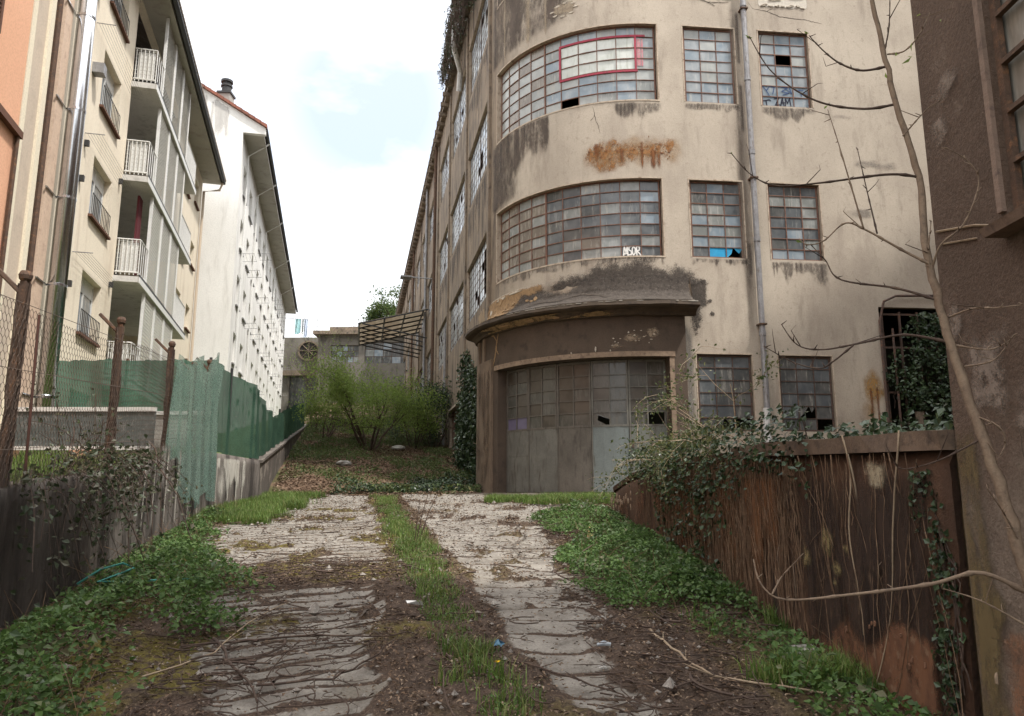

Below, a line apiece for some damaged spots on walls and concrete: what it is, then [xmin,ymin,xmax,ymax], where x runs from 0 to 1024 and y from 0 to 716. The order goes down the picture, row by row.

damp [765,108,810,121]
damp [440,116,549,302]
damp [773,262,827,282]
damp [478,257,715,449]
rust [865,373,884,420]